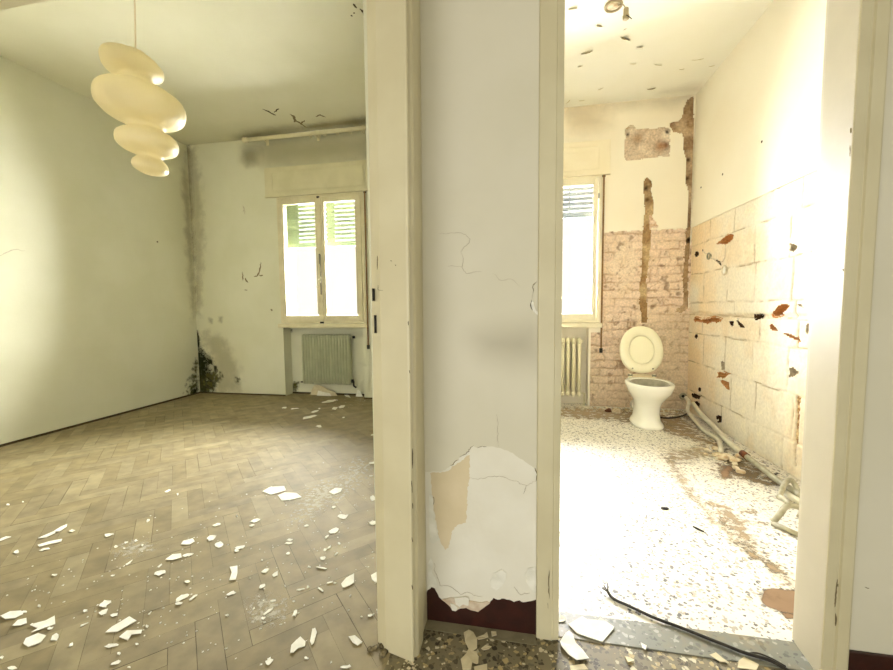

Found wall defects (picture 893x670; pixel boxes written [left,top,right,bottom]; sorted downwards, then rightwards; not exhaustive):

spalling [624,125,671,161]
water stain [187,332,223,395]
flaking render [590,170,818,481]
peeling [425,446,537,612]